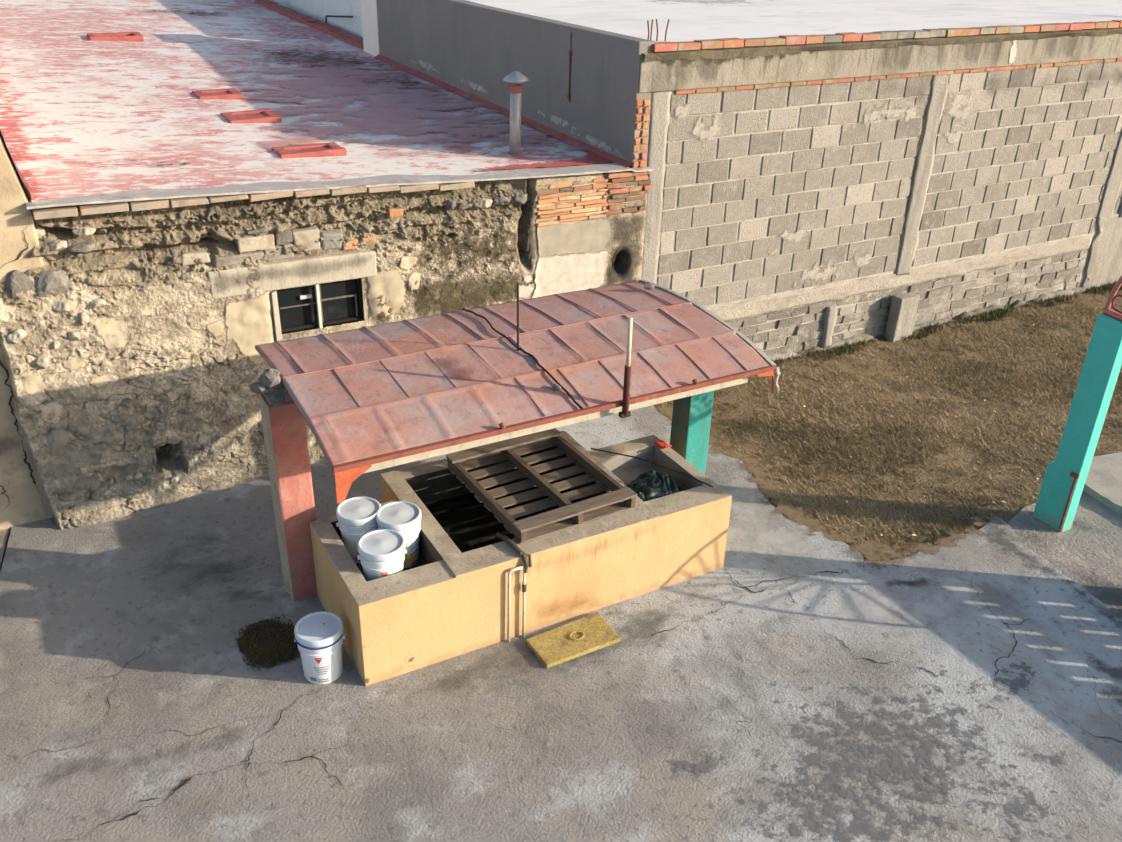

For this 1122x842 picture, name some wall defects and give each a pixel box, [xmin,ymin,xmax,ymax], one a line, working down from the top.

crack [0,216,29,269]
crack [0,344,48,516]
hole [157,443,180,458]
crack [648,551,861,641]
crack [817,580,1028,686]
crack [10,617,351,842]
crack [1050,668,1122,742]